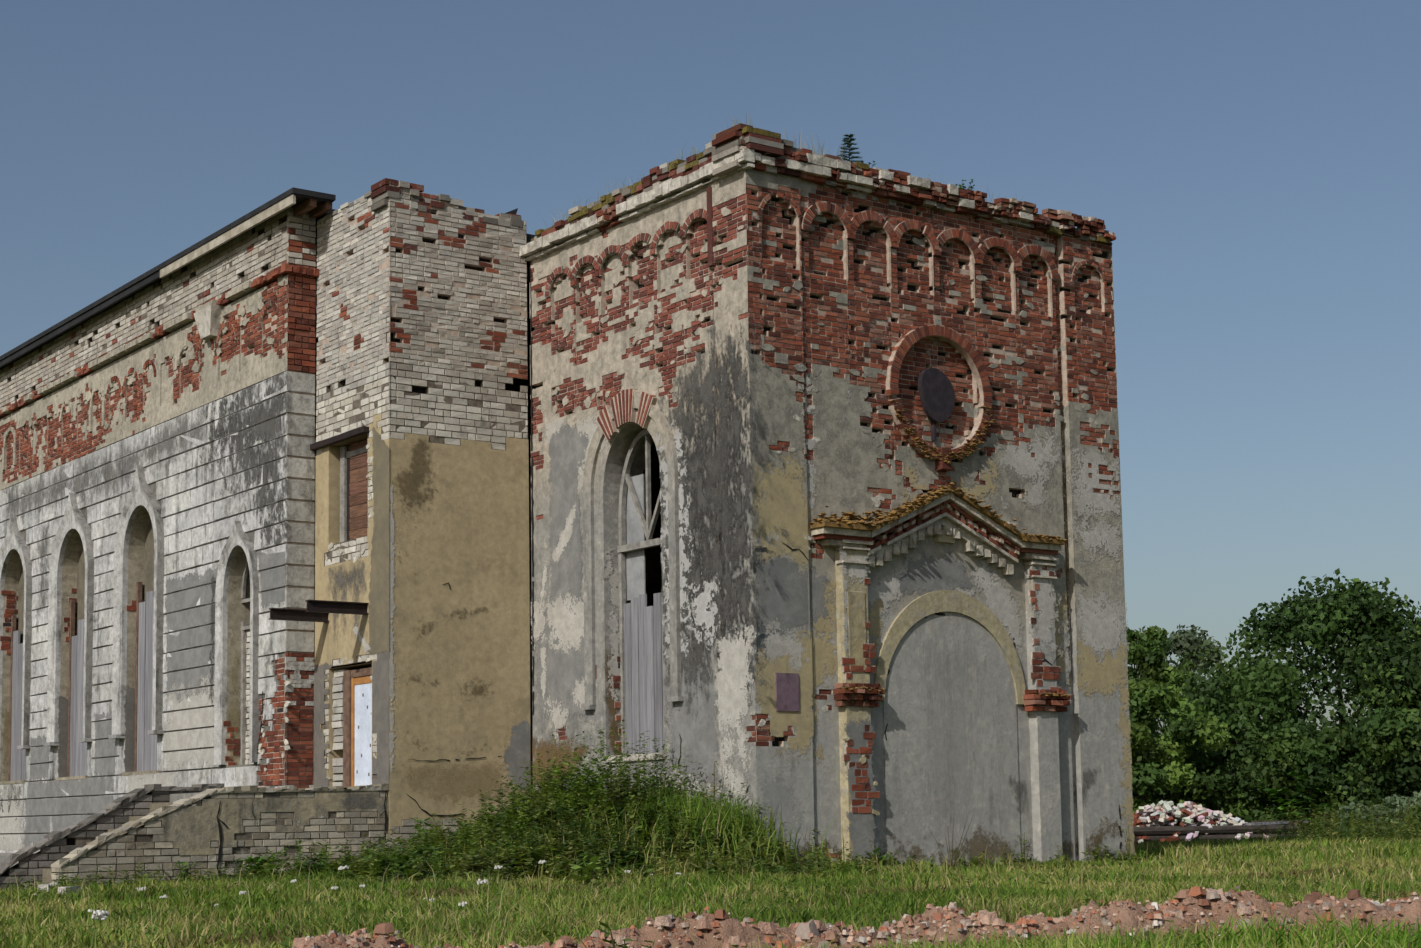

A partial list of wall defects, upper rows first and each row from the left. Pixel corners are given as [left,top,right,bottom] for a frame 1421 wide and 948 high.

spalling [0,590,18,655]
peeling [0,735,50,850]
spalling [0,276,289,491]
water stain [6,372,288,612]
peeling [94,674,241,796]
crack [217,800,255,878]
flaking render [154,430,479,876]
water stain [395,441,437,507]
water stain [657,320,768,714]
spalling [480,170,1135,867]